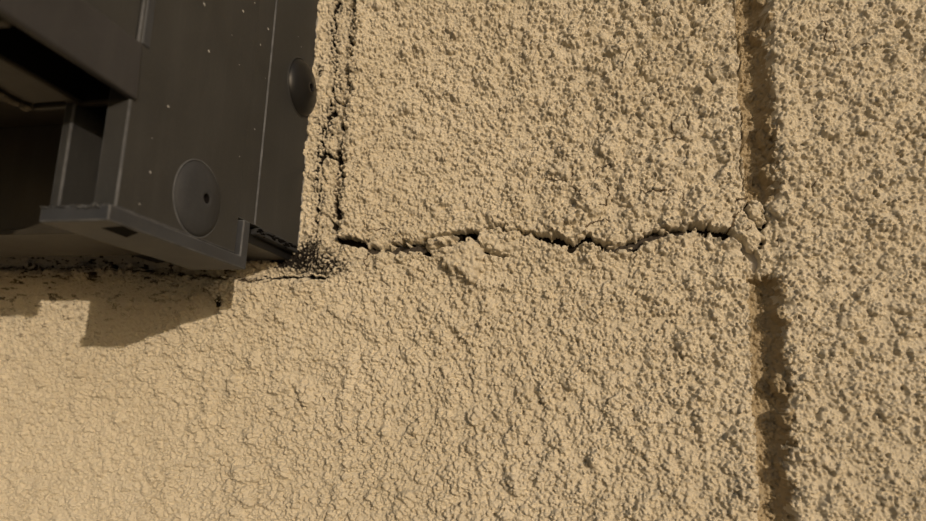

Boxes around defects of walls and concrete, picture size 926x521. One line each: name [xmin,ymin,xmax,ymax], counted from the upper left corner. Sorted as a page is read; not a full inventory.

crack [333,0,355,53]
water stain [0,0,351,302]
crack [315,84,779,270]